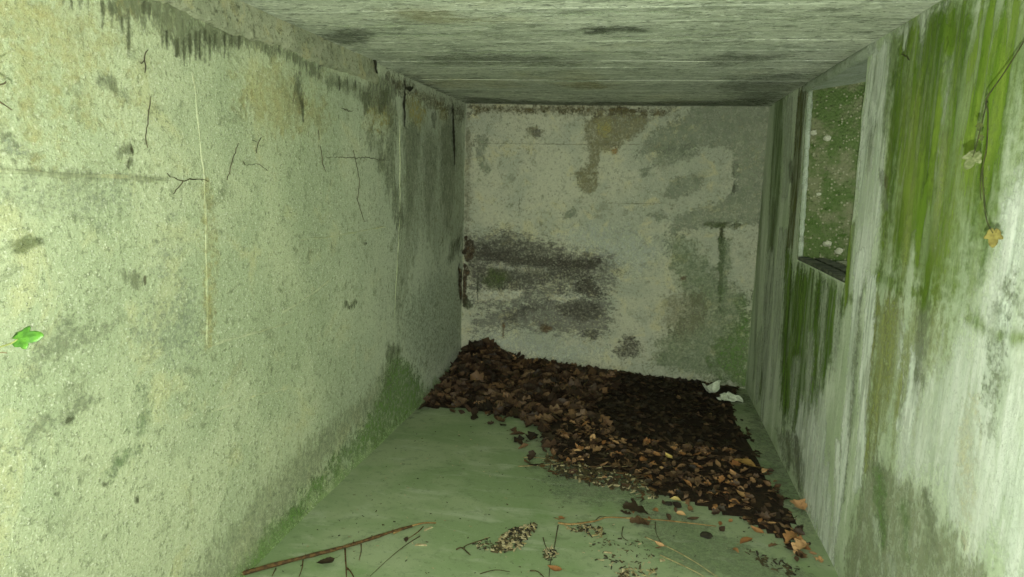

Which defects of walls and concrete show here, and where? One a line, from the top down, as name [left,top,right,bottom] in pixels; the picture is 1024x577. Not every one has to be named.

crack [141,49,152,148]
crack [167,138,268,194]
crack [318,130,388,222]
leakage [101,0,768,227]
crack [452,106,724,165]
leakage [448,223,746,383]
leakage [743,3,1024,577]